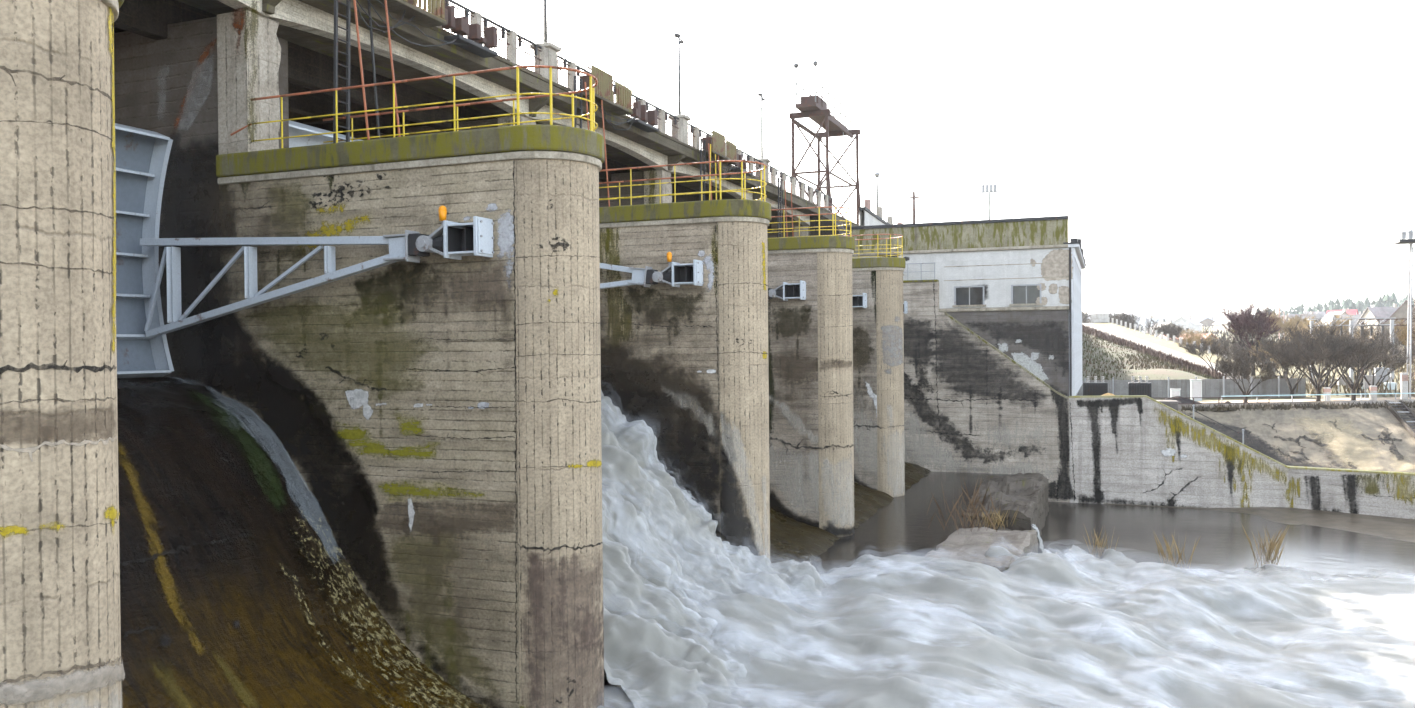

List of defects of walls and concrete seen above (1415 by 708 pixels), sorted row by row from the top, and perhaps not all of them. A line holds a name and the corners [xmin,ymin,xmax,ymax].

crack [0,360,116,404]
crack [0,436,117,462]
damp [0,59,515,708]
damp [903,317,1200,508]
crack [1143,468,1198,503]
damp [1161,414,1414,514]
damp [523,555,604,708]